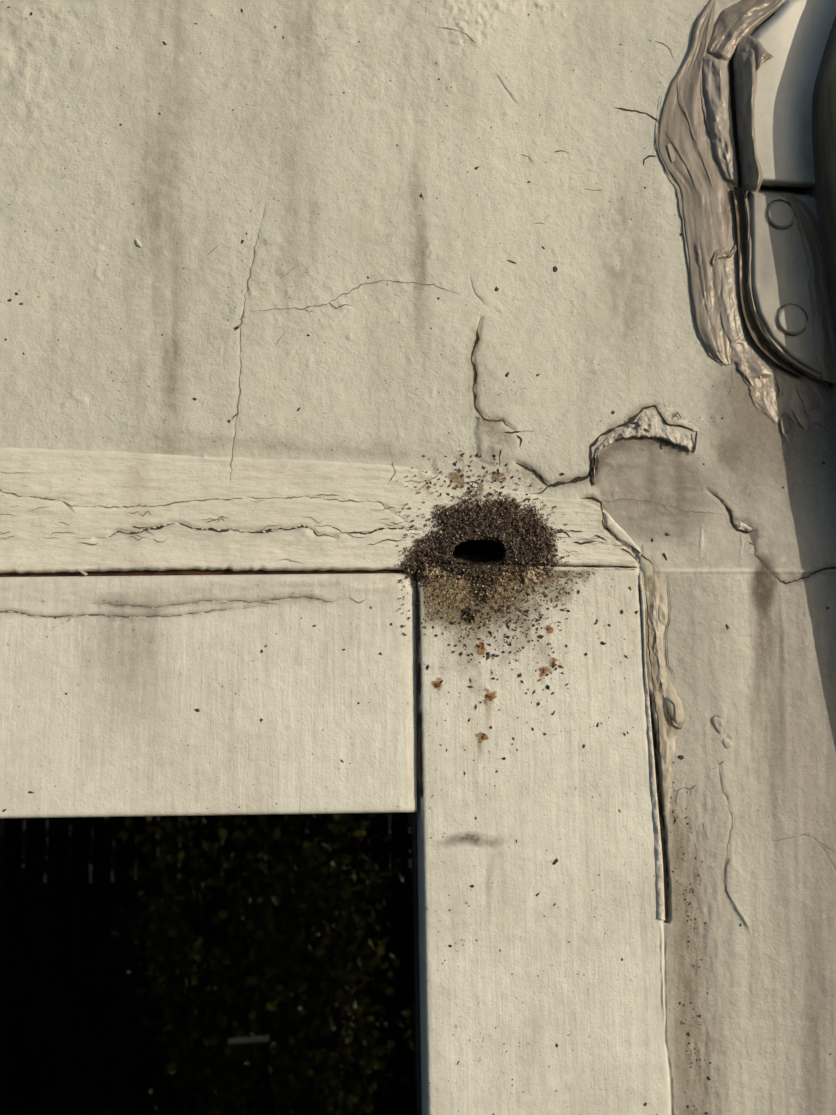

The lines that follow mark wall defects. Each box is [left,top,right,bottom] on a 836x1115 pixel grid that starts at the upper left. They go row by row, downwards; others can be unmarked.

crack [0,204,727,755]
peeling [589,402,699,485]
spalling [419,539,545,584]
crack [749,536,836,584]
crack [676,761,733,898]